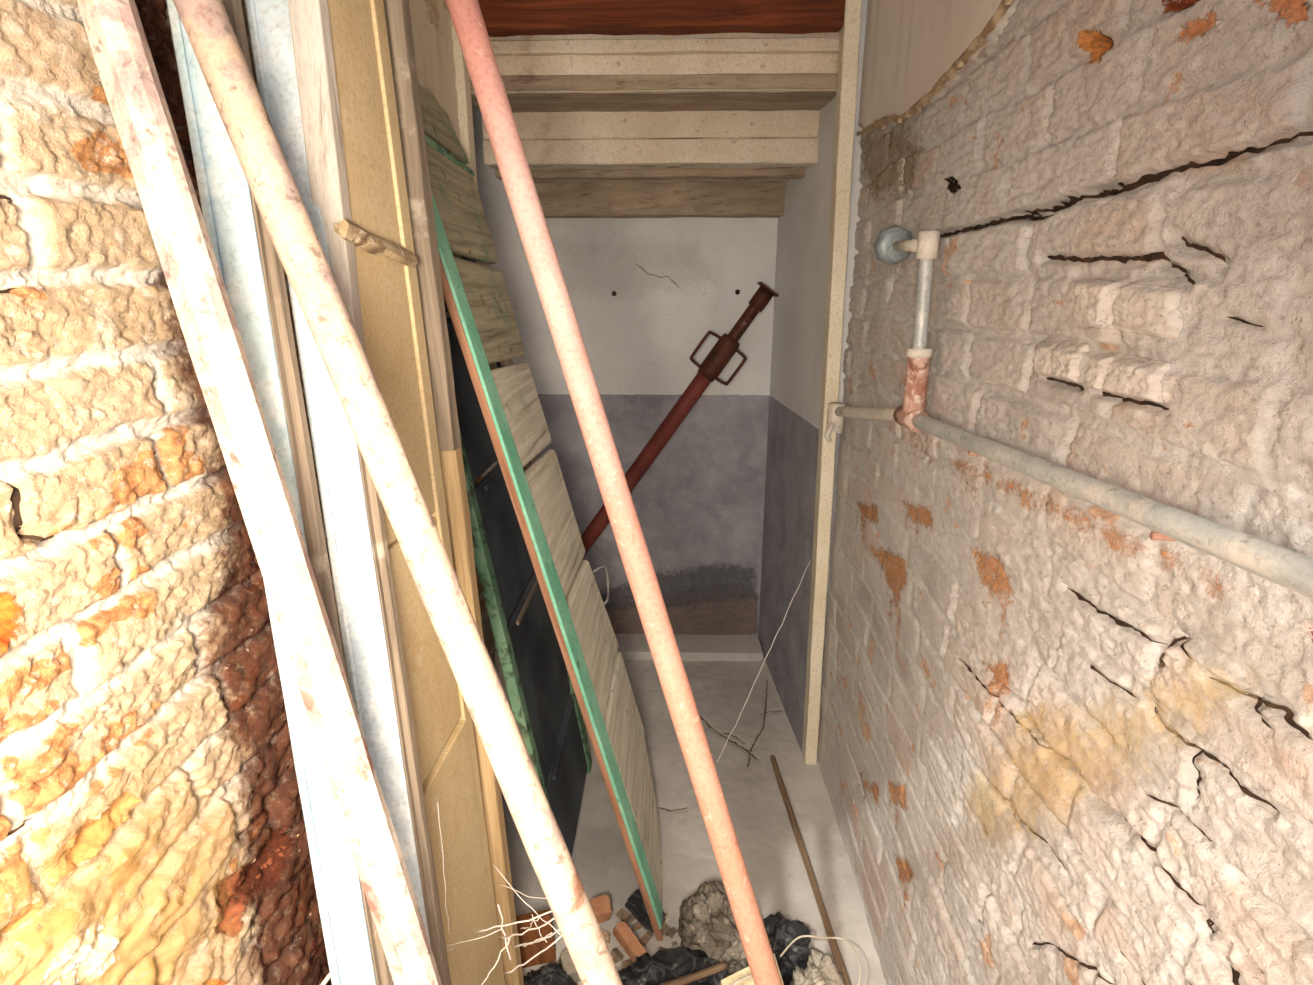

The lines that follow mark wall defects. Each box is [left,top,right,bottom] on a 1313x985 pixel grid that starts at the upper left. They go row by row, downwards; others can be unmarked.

spalling [1253,0,1308,33]
water stain [134,0,203,216]
crack [940,131,1313,237]
crack [1047,236,1228,285]
spalling [0,592,24,654]
water stain [154,272,332,985]
crack [1067,587,1313,740]
crack [1090,664,1277,842]
crack [7,817,34,837]
water stain [38,921,120,985]
crack [1033,942,1145,985]
crack [1125,819,1264,985]